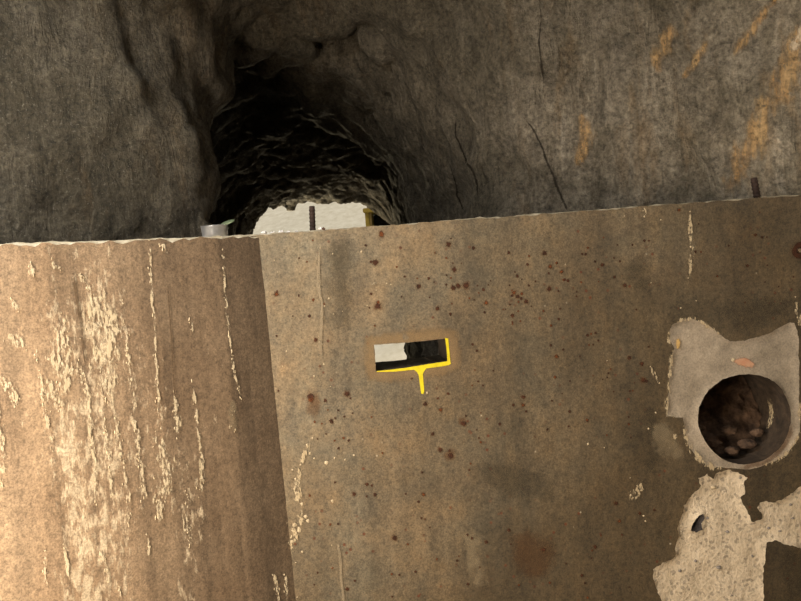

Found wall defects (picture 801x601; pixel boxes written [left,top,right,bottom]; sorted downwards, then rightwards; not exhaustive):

crack [537,0,545,81]
crack [451,123,478,209]
crack [528,123,567,209]
leakage [148,239,161,416]
leakage [34,286,137,506]
leakage [103,417,177,520]
leakage [191,379,204,498]
spalling [653,317,801,601]